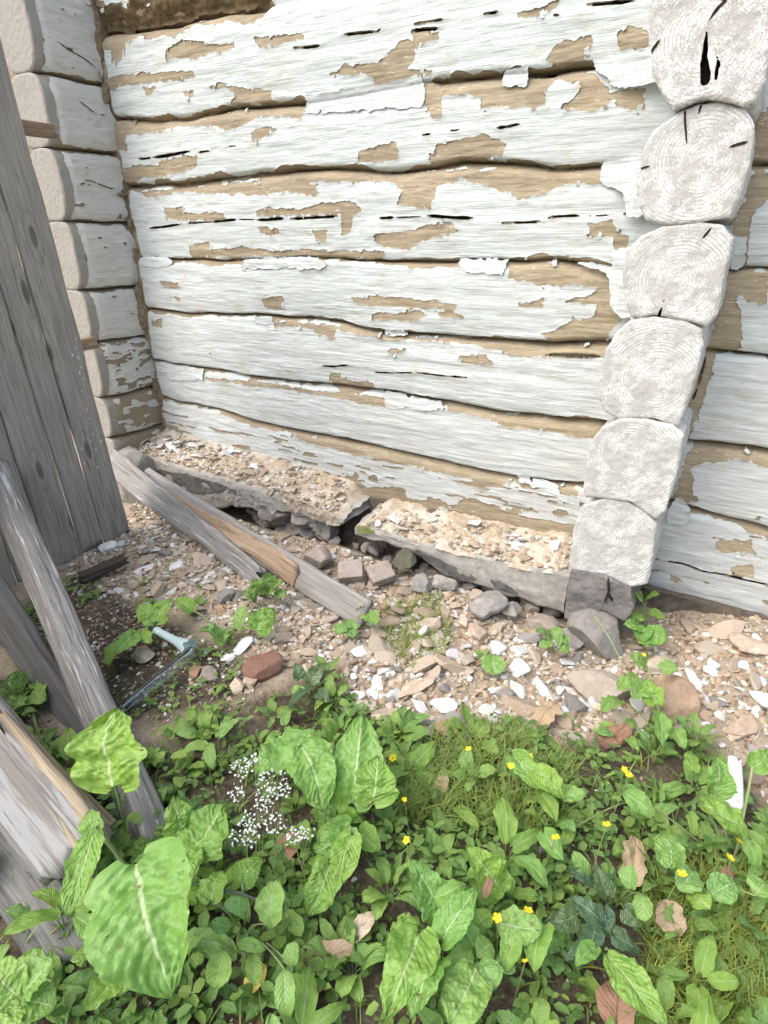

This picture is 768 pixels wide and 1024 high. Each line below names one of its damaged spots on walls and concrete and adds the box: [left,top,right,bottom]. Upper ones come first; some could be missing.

spalling [94,0,271,100]
peeling [114,24,656,152]
crack [684,0,727,144]
crack [140,145,236,160]
crack [149,215,338,229]
peeling [189,221,459,271]
peeling [121,133,643,237]
crack [380,213,472,221]
peeling [254,220,633,365]
crack [502,213,626,224]
peeling [667,108,768,525]
crack [604,578,613,603]